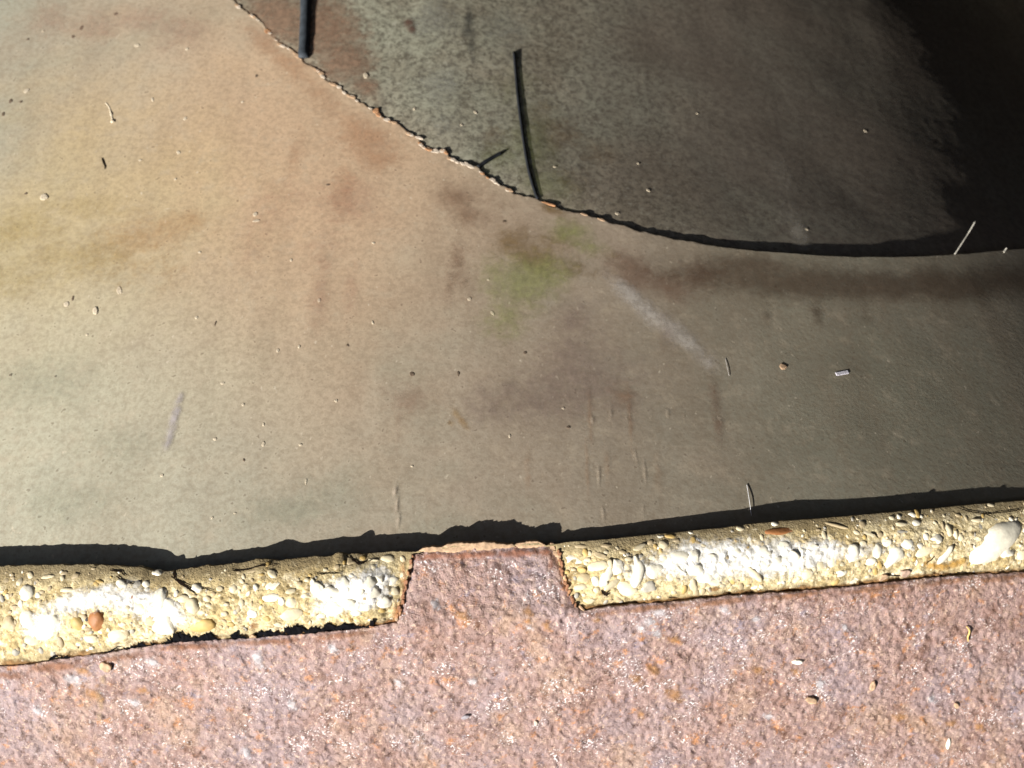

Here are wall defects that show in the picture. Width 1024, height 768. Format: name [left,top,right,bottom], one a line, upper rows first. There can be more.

spalling [235,4,514,192]
corrosion [319,540,612,639]
corrosion [627,586,818,612]
corrosion [838,558,1022,593]
corrosion [0,651,89,679]